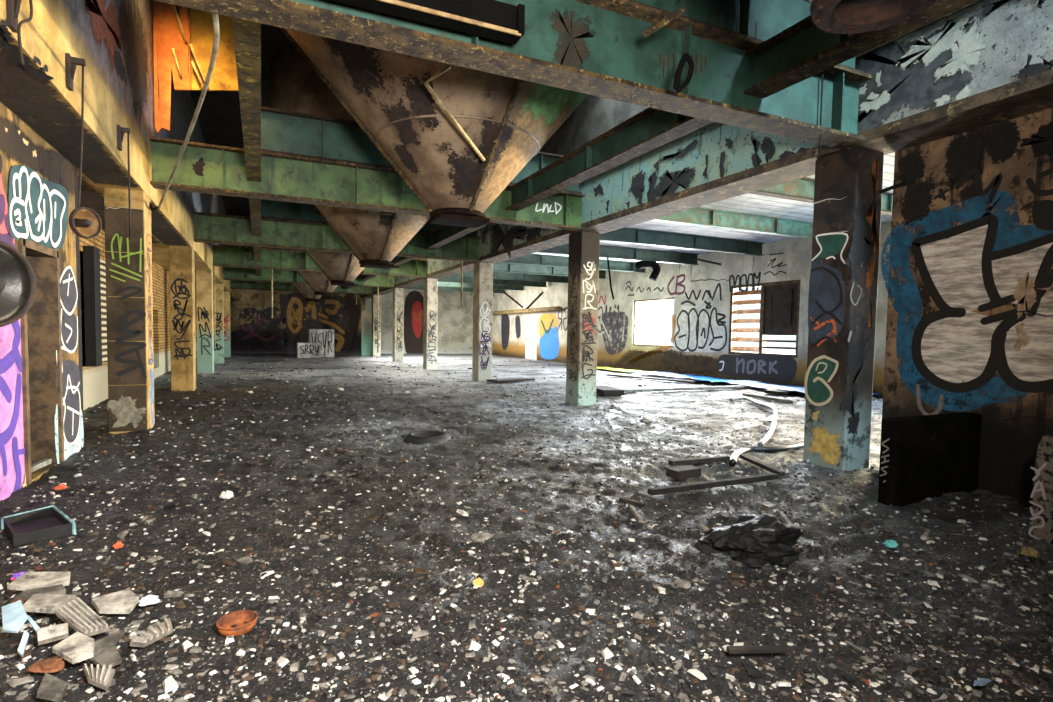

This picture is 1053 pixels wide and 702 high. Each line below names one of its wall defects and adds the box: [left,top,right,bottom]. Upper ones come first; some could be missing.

peeling [855,0,1021,133]
rust [321,36,441,177]
rust [445,115,520,201]
peeling [593,183,609,213]
peeling [626,138,733,208]
peeling [751,134,810,167]
spalling [1020,121,1053,157]